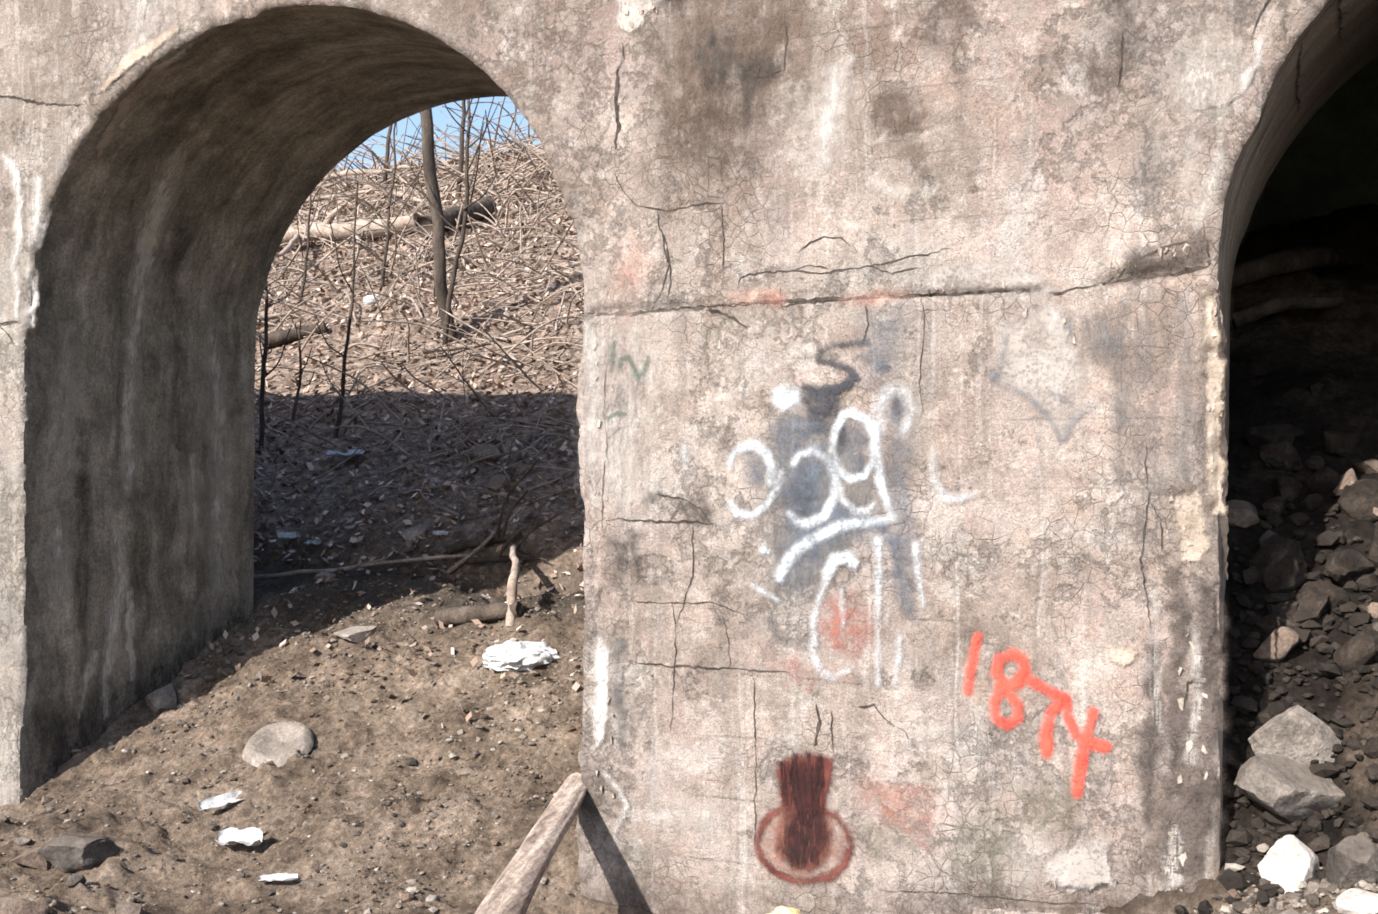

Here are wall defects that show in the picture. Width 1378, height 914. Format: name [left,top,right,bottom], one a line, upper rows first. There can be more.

peeling [616,0,663,32]
crack [0,95,84,106]
damp [649,0,799,151]
damp [820,72,840,163]
damp [870,91,924,166]
crack [1295,43,1303,112]
crack [590,43,1229,888]
spalling [1108,234,1226,893]